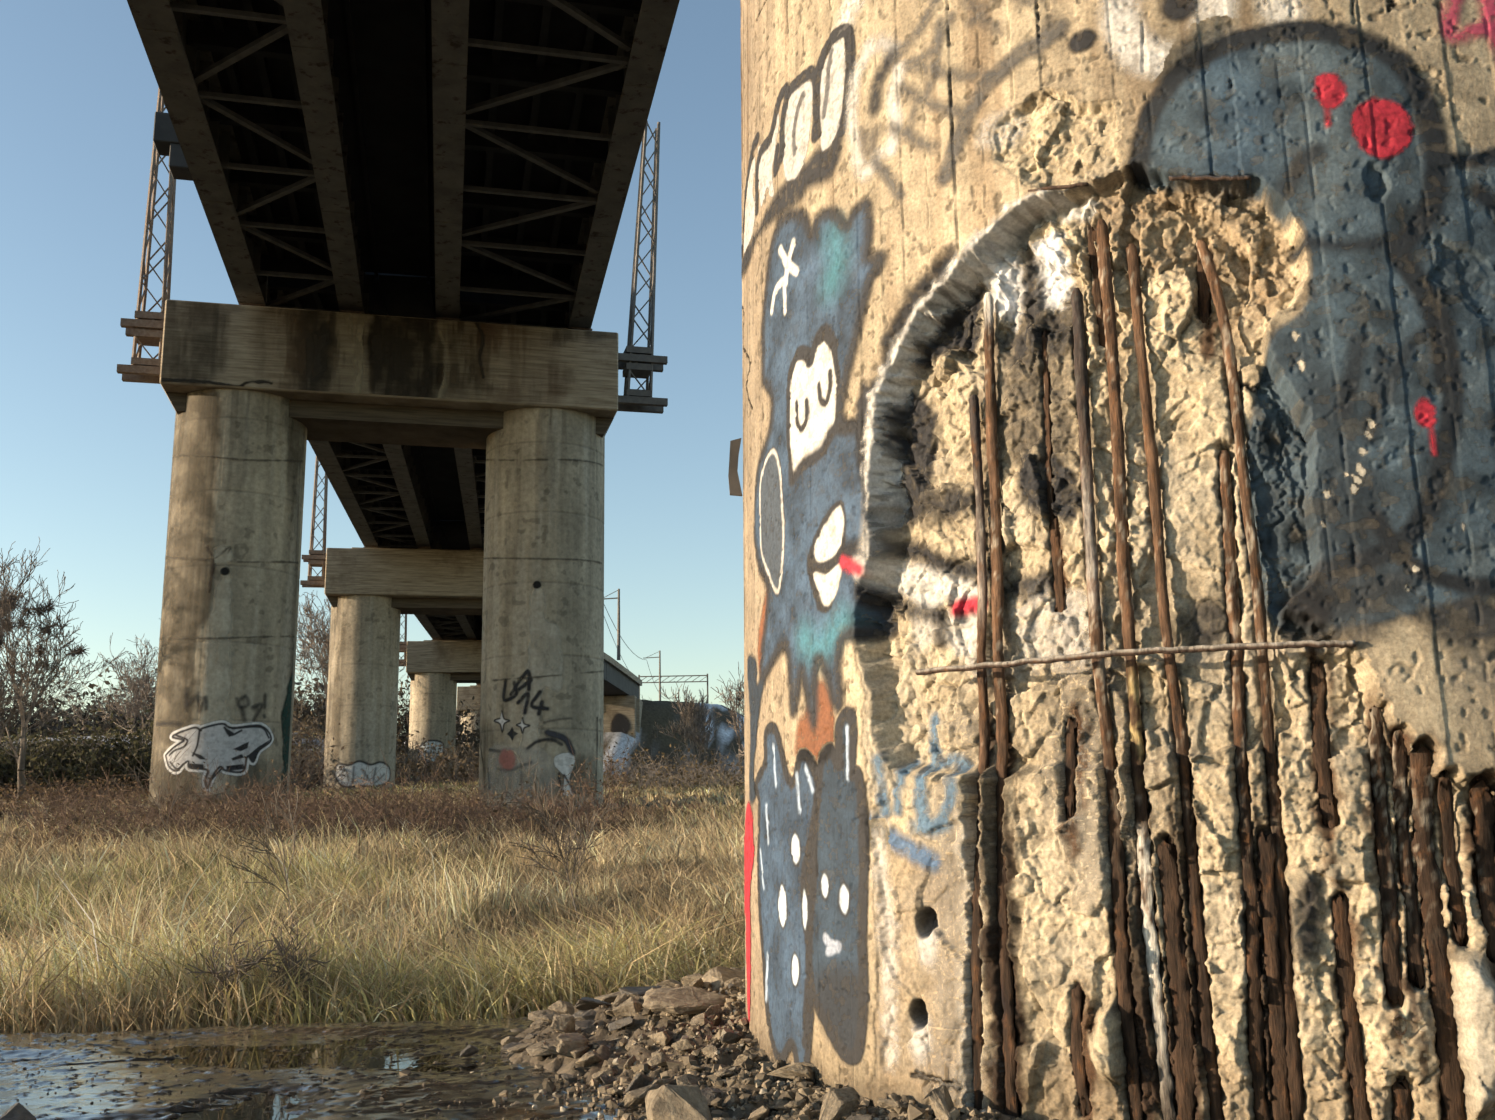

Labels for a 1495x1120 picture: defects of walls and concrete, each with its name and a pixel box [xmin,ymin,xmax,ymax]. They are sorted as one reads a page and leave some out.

spalling [1415,64,1437,79]
leakage [291,310,489,398]
spalling [853,86,1495,1120]